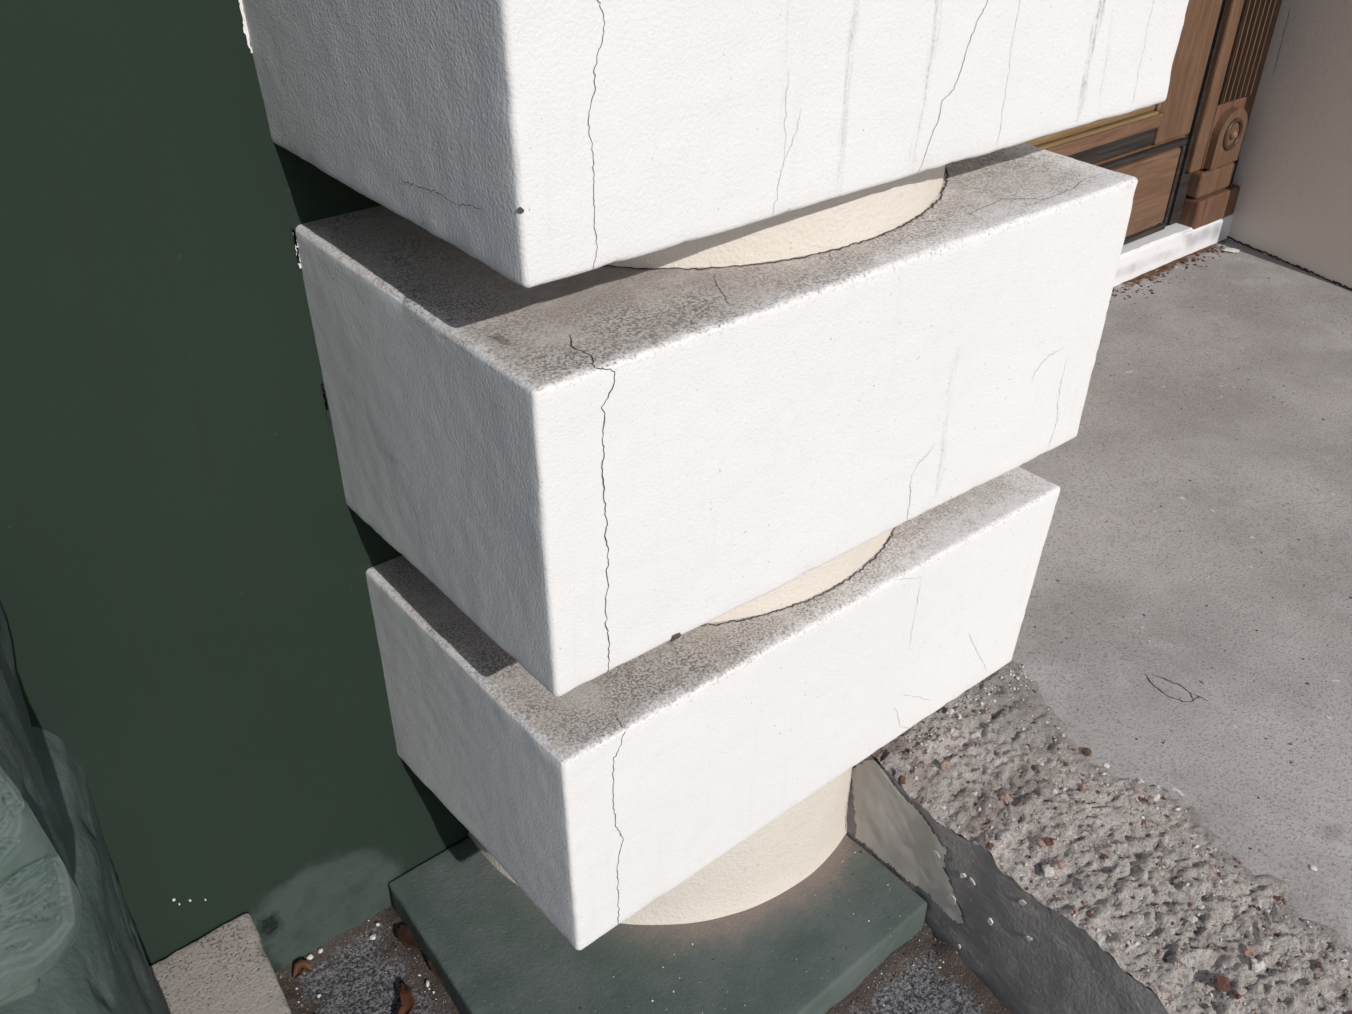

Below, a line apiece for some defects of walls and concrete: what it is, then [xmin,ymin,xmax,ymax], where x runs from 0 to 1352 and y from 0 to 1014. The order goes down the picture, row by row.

crack [401,179,479,209]
crack [588,0,1080,305]
crack [569,334,615,671]
crack [612,718,625,926]
spalling [851,660,1352,1014]